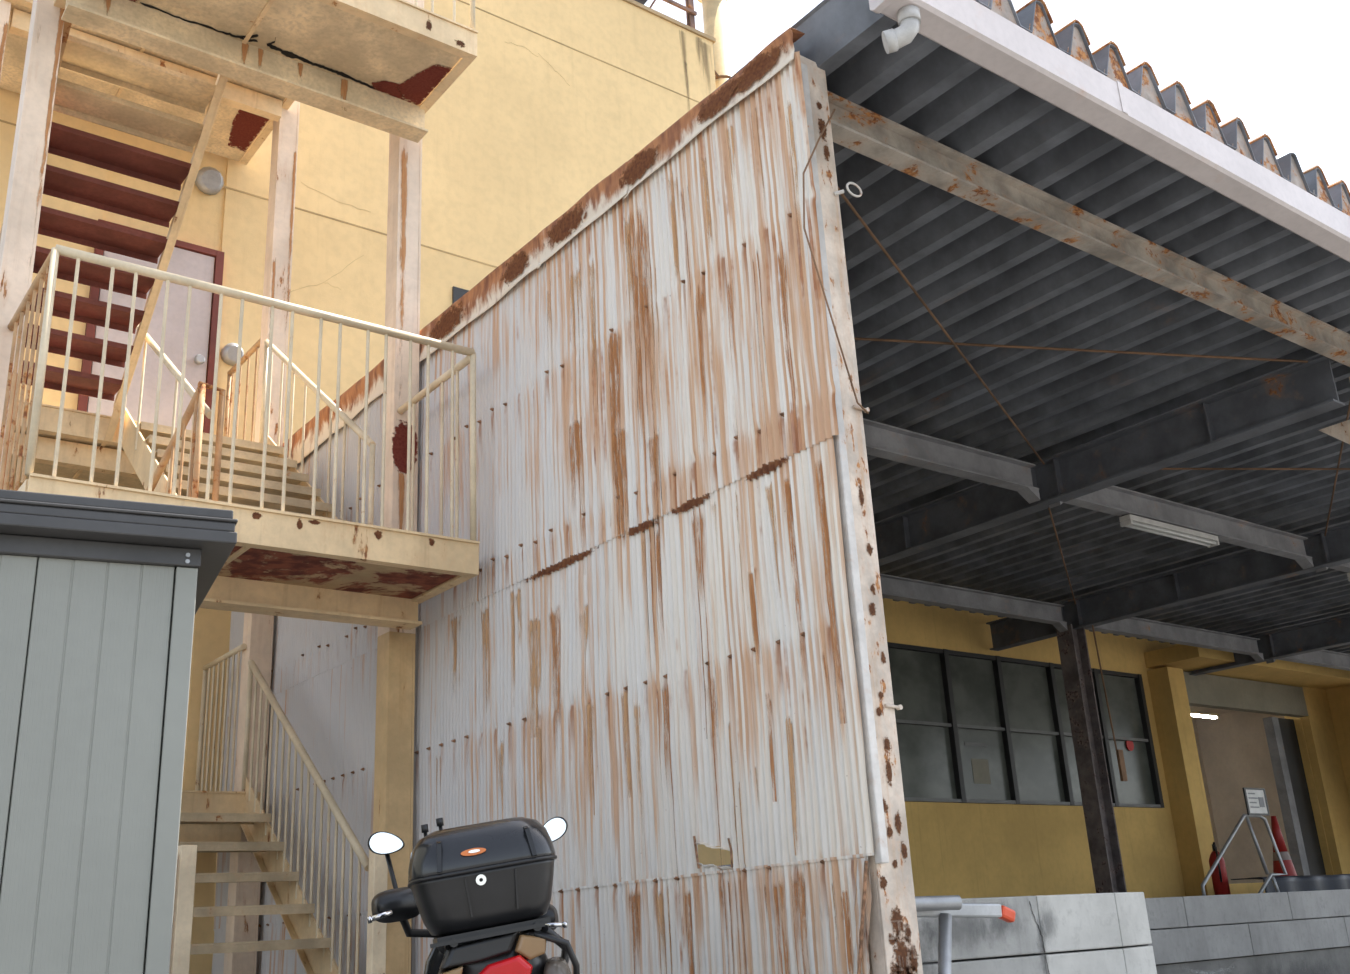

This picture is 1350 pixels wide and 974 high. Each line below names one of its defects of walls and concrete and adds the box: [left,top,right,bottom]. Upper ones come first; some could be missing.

crack [140,2,375,89]
rust [372,64,452,105]
rust [697,41,787,123]
rust [228,110,269,152]
rust [619,146,658,188]
rust [544,202,587,248]
rust [429,301,465,340]
rust [392,420,418,529]
rust [569,212,747,974]
rust [746,457,802,650]
rust [815,463,845,724]
rust [511,547,599,801]